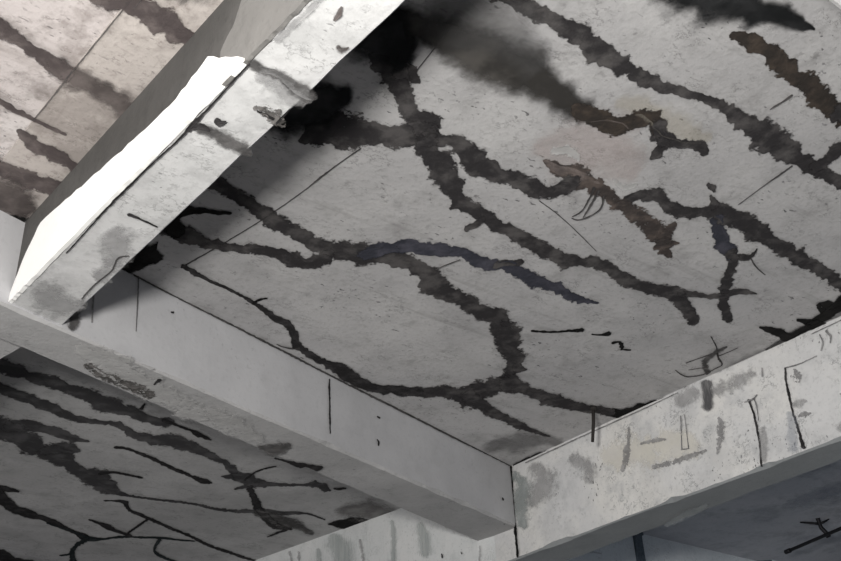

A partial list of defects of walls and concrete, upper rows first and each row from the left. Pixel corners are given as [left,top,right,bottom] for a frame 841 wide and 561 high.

leakage [89,0,195,44]
leakage [664,0,815,31]
leakage [0,17,133,117]
leakage [402,9,709,162]
leakage [0,160,62,222]
leakage [16,129,77,171]
crack [66,0,841,326]
crack [133,149,599,504]
crack [759,295,841,342]
crack [595,392,678,431]
crack [0,382,346,537]
crack [0,485,256,561]